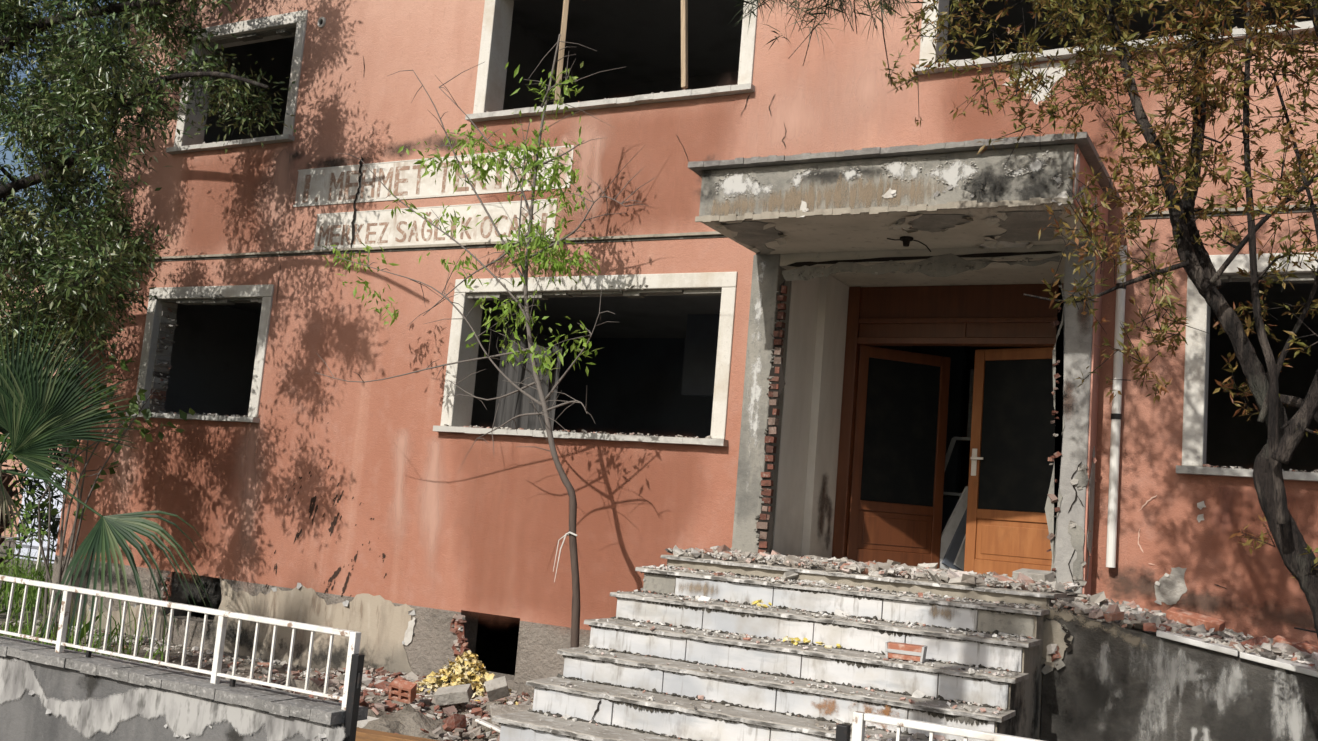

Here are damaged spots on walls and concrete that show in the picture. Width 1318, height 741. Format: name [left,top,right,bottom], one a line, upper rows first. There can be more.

peeling [893,148,1100,250]
spalling [754,281,788,553]
water stain [285,466,361,542]
crack [1068,462,1084,513]
peeling [49,572,174,642]
peeling [212,576,416,676]
water stain [324,538,387,597]
peeling [0,657,345,741]